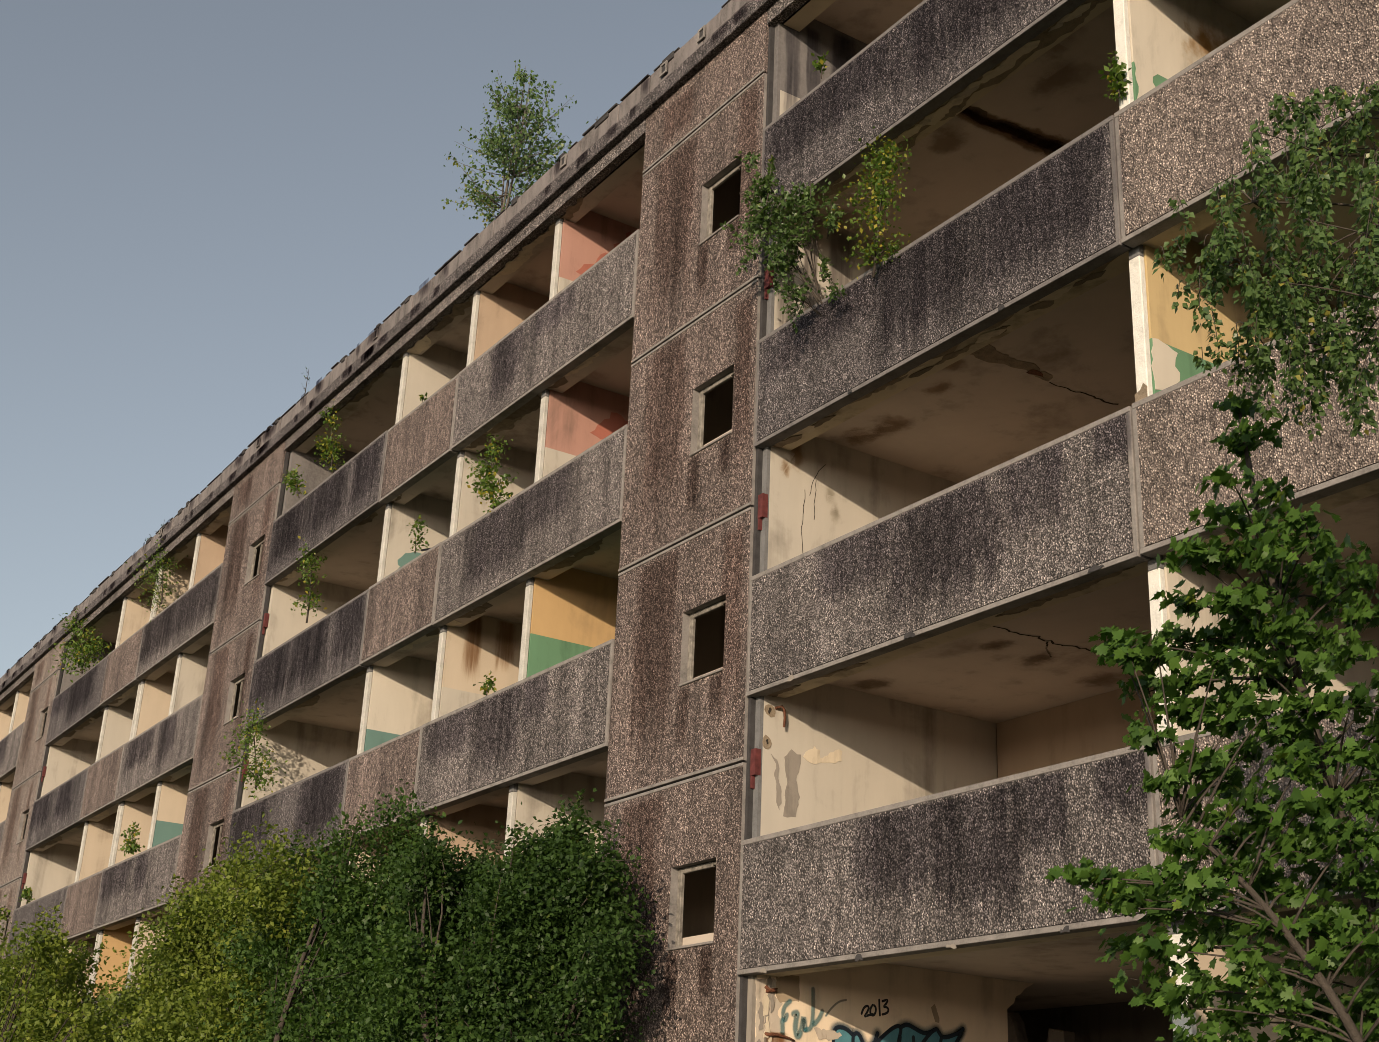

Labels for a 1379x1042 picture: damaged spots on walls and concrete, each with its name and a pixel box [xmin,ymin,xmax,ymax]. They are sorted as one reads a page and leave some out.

crack [1049,382,1118,405]
crack [992,626,1095,656]
flaking render [755,968,795,1042]